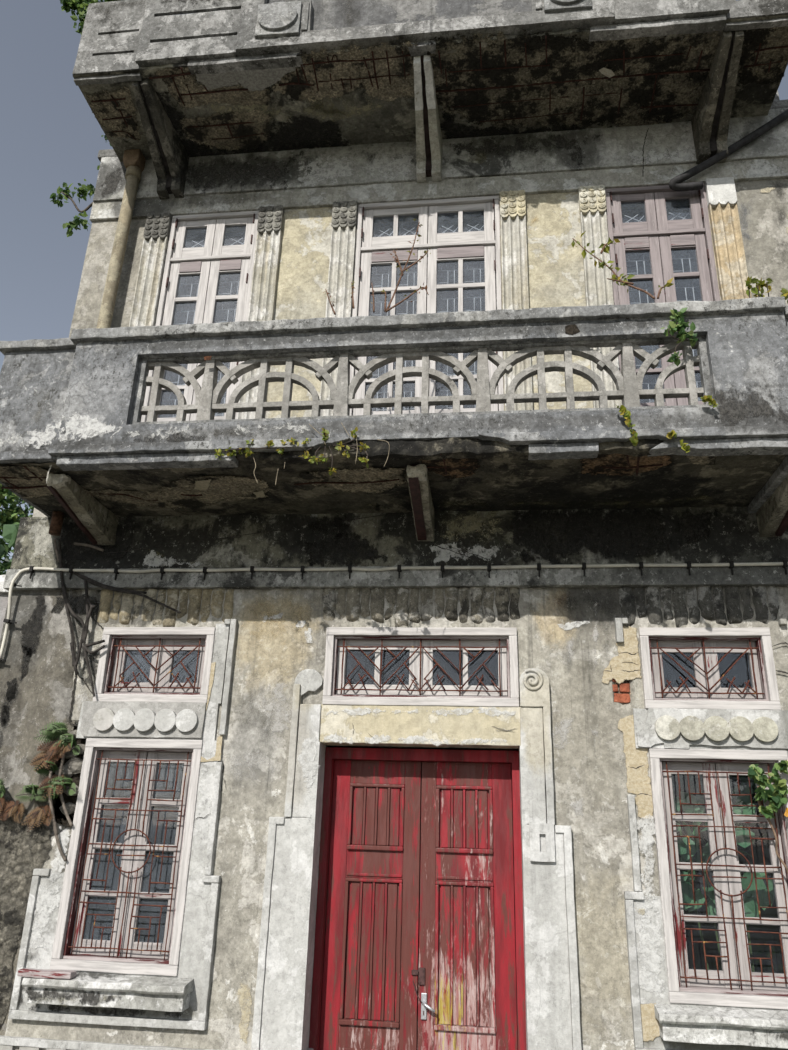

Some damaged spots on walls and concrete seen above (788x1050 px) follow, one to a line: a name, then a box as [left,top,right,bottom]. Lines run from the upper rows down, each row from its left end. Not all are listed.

spalling [85,87,141,140]
spalling [149,30,720,152]
damp [438,97,612,167]
spalling [236,437,529,493]
spalling [577,439,672,476]
damp [61,523,132,567]
damp [304,516,388,567]
damp [506,496,718,565]
damp [0,595,82,748]
peeling [595,626,665,1042]